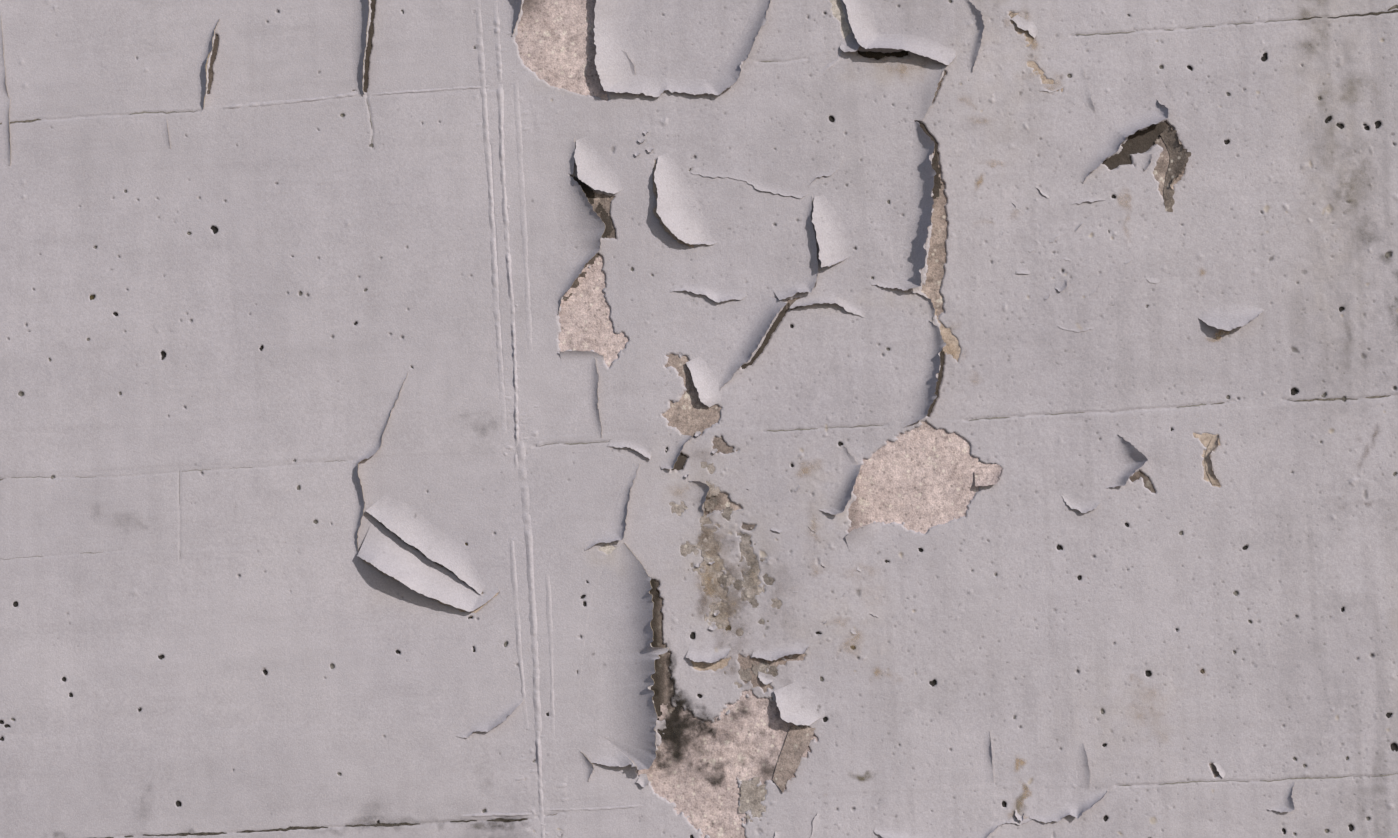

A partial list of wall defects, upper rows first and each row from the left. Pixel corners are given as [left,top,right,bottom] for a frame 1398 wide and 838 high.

peeling [197,19,220,109]
peeling [352,0,376,139]
peeling [504,0,771,101]
peeling [1072,98,1191,212]
peeling [816,0,1003,552]
peeling [1198,303,1264,331]
peeling [352,372,500,613]
peeling [554,130,865,838]
peeling [1061,435,1156,513]
spalling [1193,433,1221,488]
water stain [658,662,716,767]
peeling [874,788,1108,838]